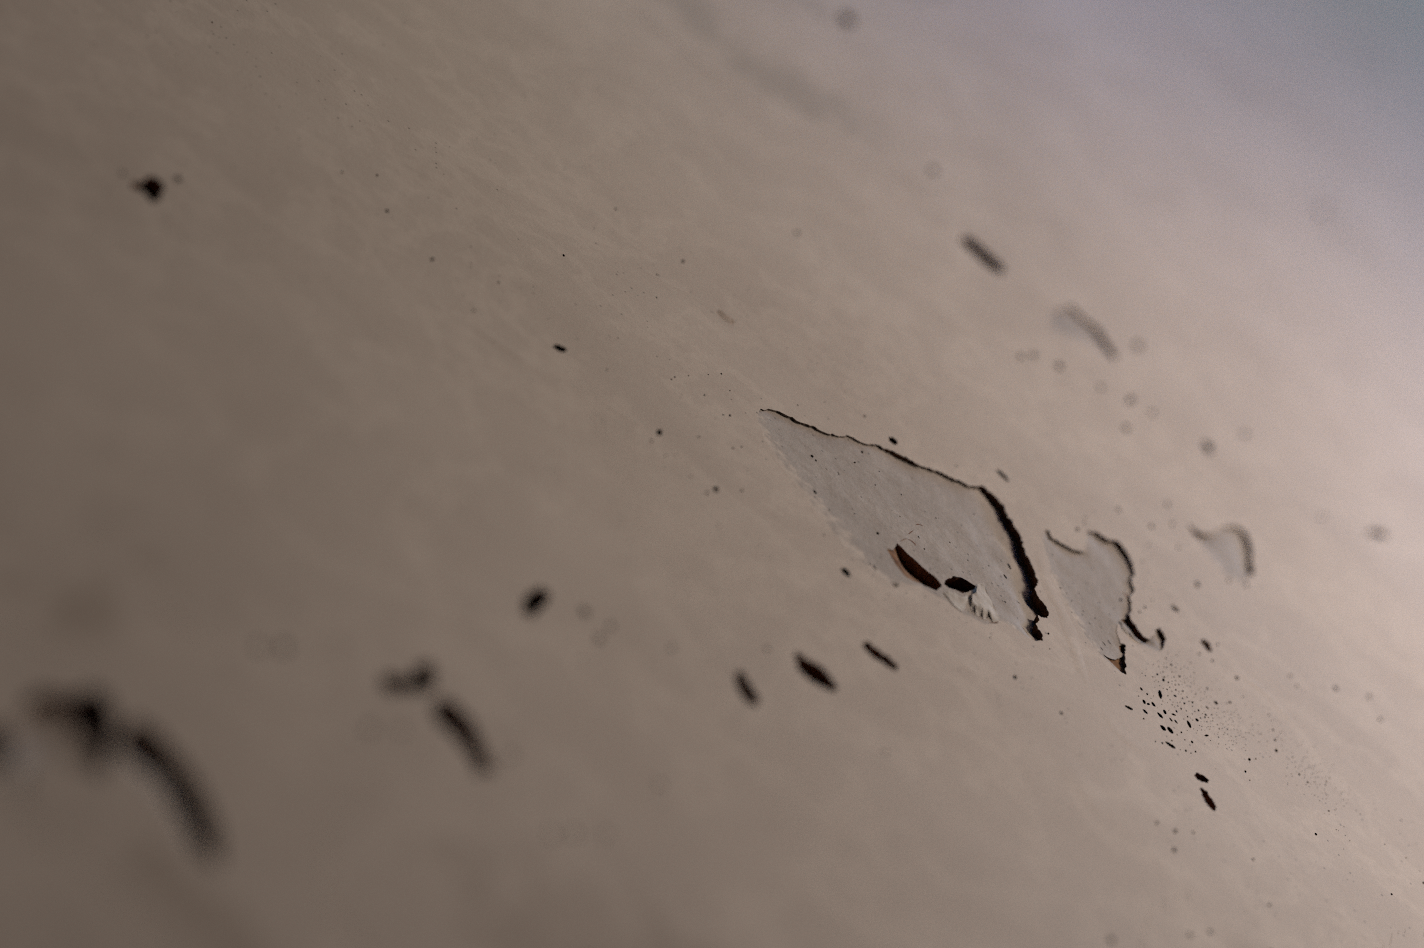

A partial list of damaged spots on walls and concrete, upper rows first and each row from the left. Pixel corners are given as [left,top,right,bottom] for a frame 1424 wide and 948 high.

spalling [960,236,1006,274]
spalling [1050,305,1117,359]
spalling [757,409,1166,675]
spalling [1188,524,1254,582]
spalling [734,670,760,706]
spalling [794,652,838,692]